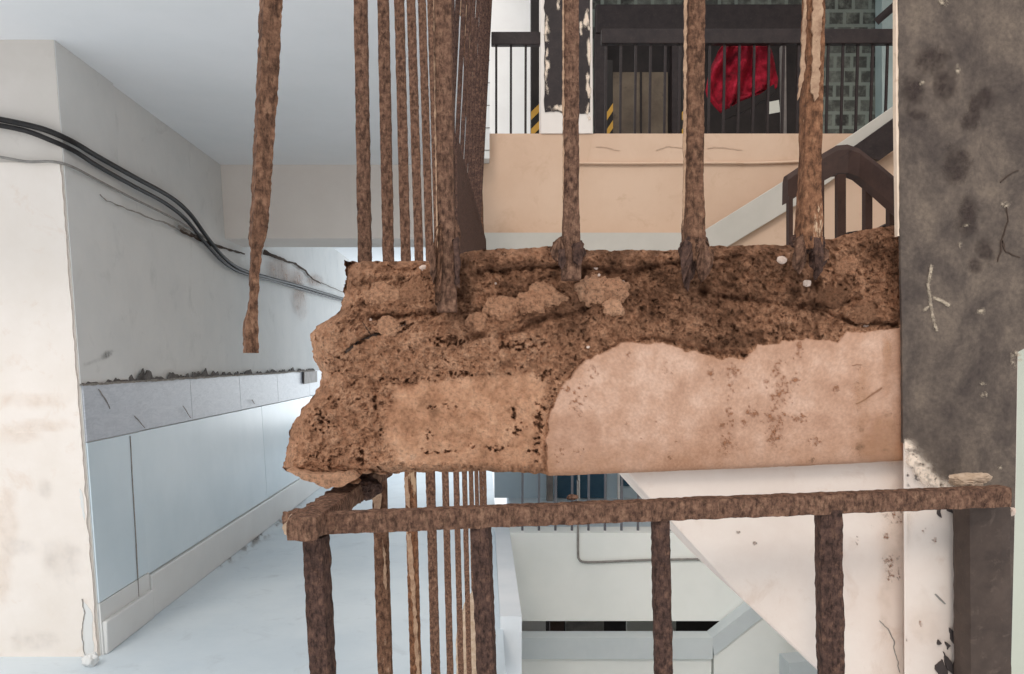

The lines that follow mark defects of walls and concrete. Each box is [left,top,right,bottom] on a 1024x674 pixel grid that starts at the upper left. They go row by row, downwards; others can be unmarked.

crack [100,194,342,292]
corrosion [428,224,444,306]
corrosion [550,236,584,266]
corrosion [680,236,714,292]
spalling [80,225,900,489]